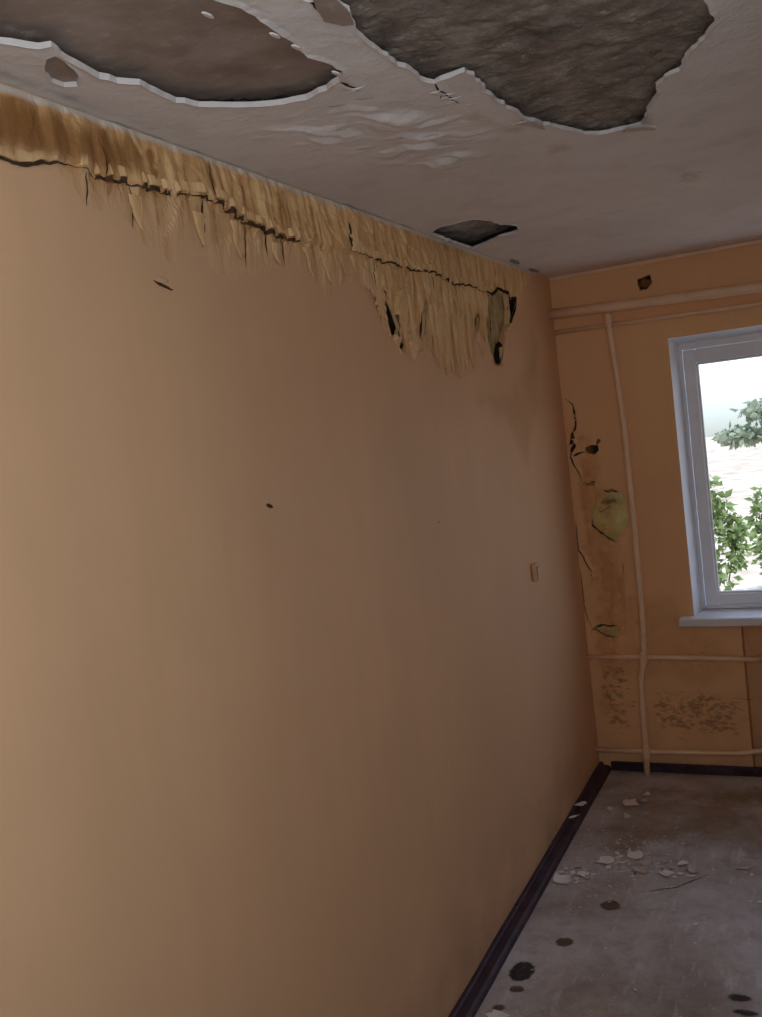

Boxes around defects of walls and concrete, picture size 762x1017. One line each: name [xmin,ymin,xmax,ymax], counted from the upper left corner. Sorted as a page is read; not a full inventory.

spalling [0,0,350,108]
spalling [313,0,721,135]
crack [0,144,309,266]
peeling [0,84,539,378]
crack [349,223,493,304]
crack [566,395,586,481]
peeling [579,480,630,543]